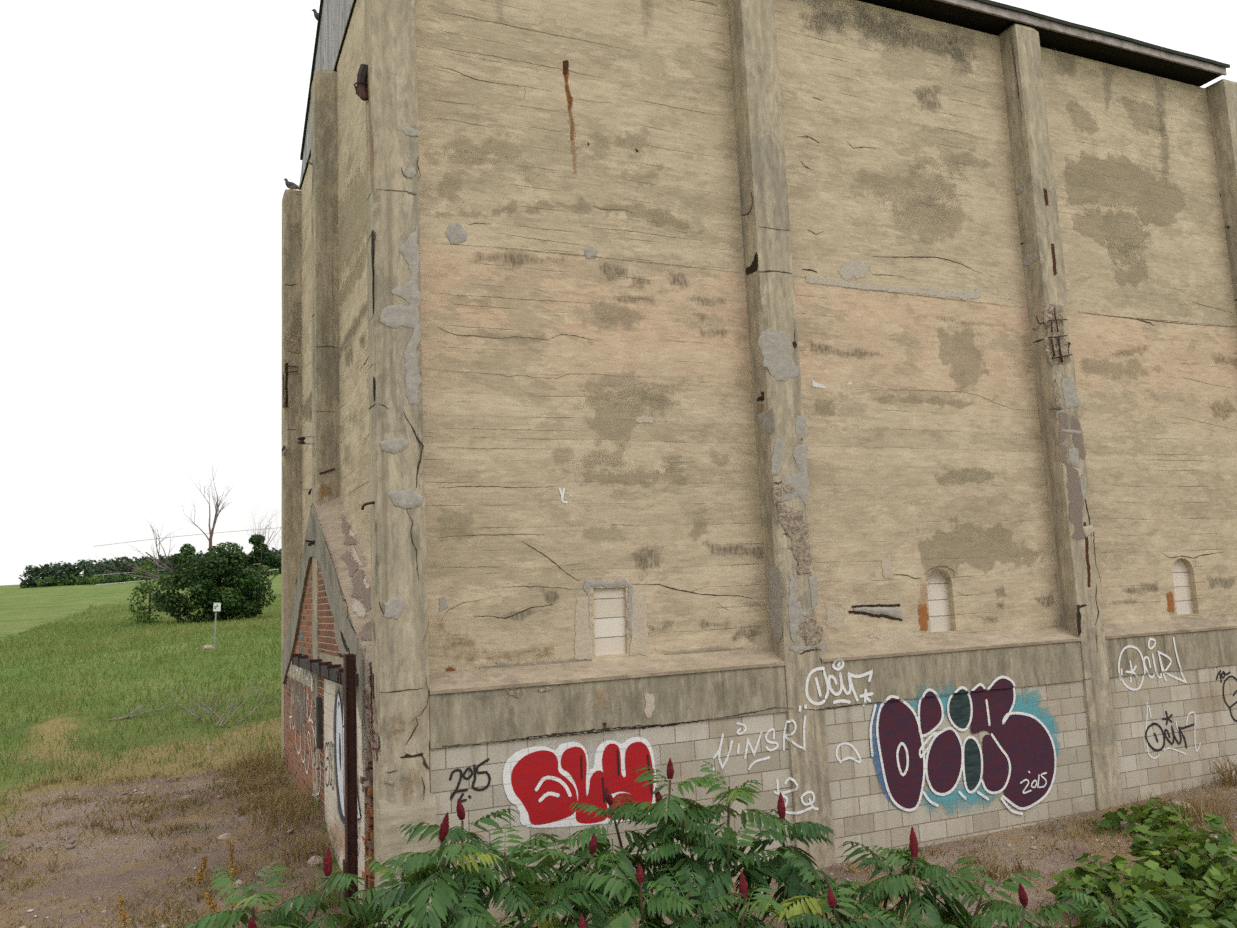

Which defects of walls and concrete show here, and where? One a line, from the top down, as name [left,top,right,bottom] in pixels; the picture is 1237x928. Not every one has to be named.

corrosion [563,60,574,140]
spalling [1032,304,1072,365]
spalling [772,436,812,575]
peeling [1059,412,1094,539]
crack [641,584,753,610]
spalling [798,614,823,654]